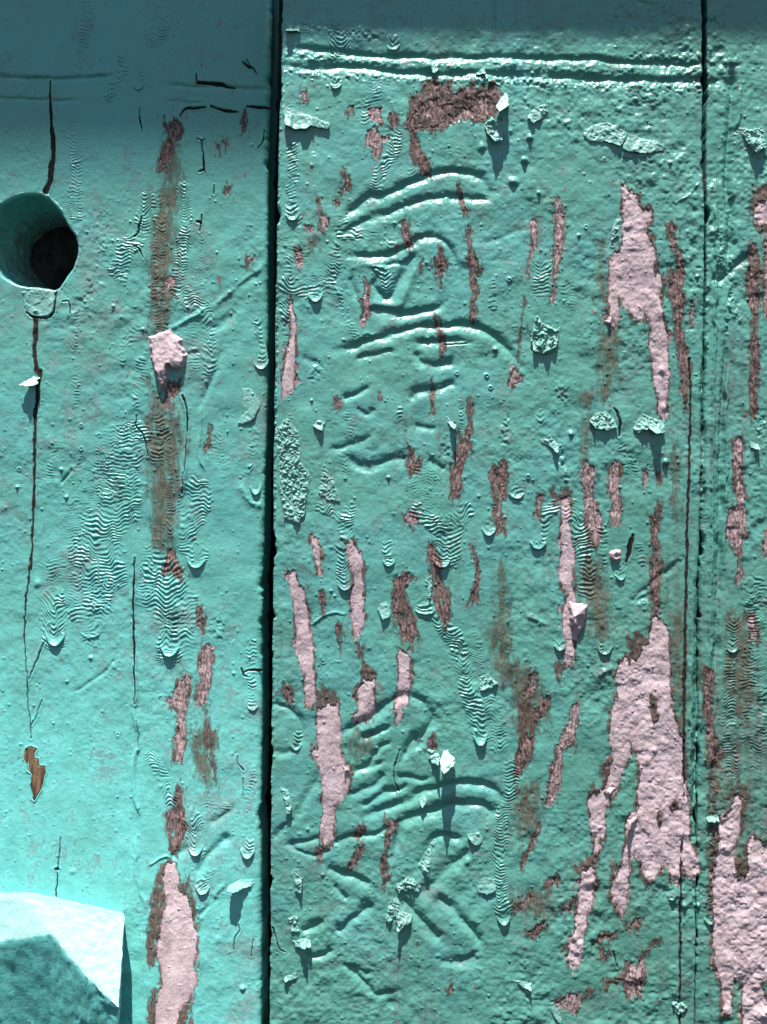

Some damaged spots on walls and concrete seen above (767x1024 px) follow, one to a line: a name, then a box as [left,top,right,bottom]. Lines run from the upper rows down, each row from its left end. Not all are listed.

crack [43,81,56,196]
crack [180,60,271,148]
peeling [365,59,509,181]
peeling [602,179,695,434]
spalling [22,744,48,803]
crack [23,291,71,739]
peeling [277,533,455,863]
peeling [532,460,624,685]
peeling [545,501,767,1024]
crack [682,358,692,801]
peeling [146,784,200,1024]
crack [677,836,685,1024]